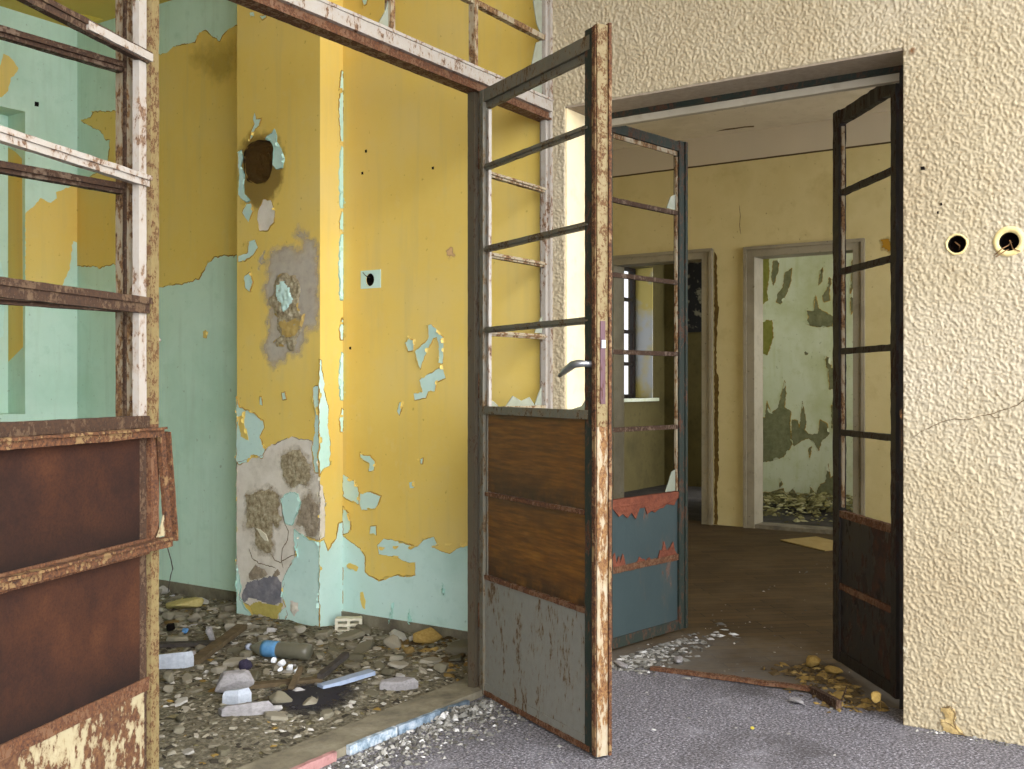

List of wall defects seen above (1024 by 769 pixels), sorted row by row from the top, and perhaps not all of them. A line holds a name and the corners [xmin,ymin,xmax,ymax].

peeling [0,54,19,97]
peeling [8,148,22,164]
peeling [0,173,116,285]
peeling [81,110,116,163]
peeling [159,25,285,293]
peeling [338,70,346,301]
peeling [0,305,23,362]
spalling [269,273,305,352]
peeling [763,254,833,507]
peeling [235,317,468,631]